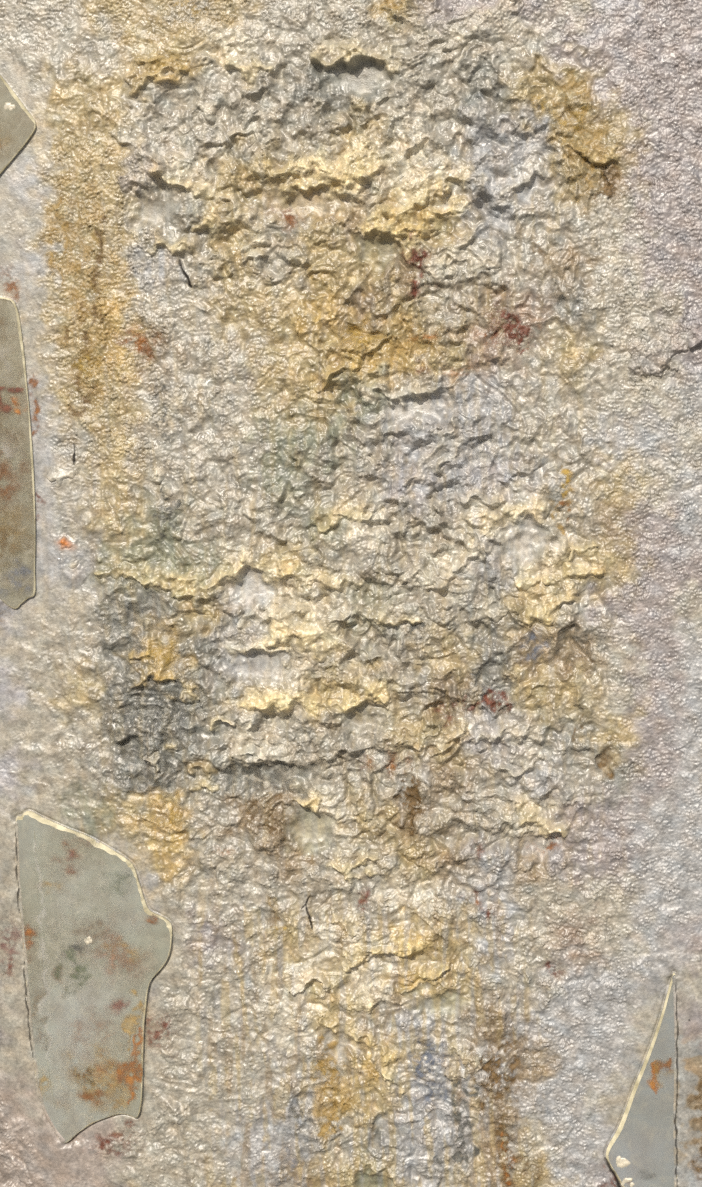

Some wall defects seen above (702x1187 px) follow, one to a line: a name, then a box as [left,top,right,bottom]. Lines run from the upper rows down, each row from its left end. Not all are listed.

spalling [309,35,406,101]
spalling [108,46,504,286]
corrosion [0,378,39,435]
spalling [309,334,472,436]
peeling [94,507,423,632]
spalling [398,480,604,628]
spalling [211,631,297,690]
spalling [327,680,437,789]
spalling [220,738,380,885]
spalling [330,896,472,1021]
corrosion [76,991,168,1104]
corrosion [650,1059,671,1091]